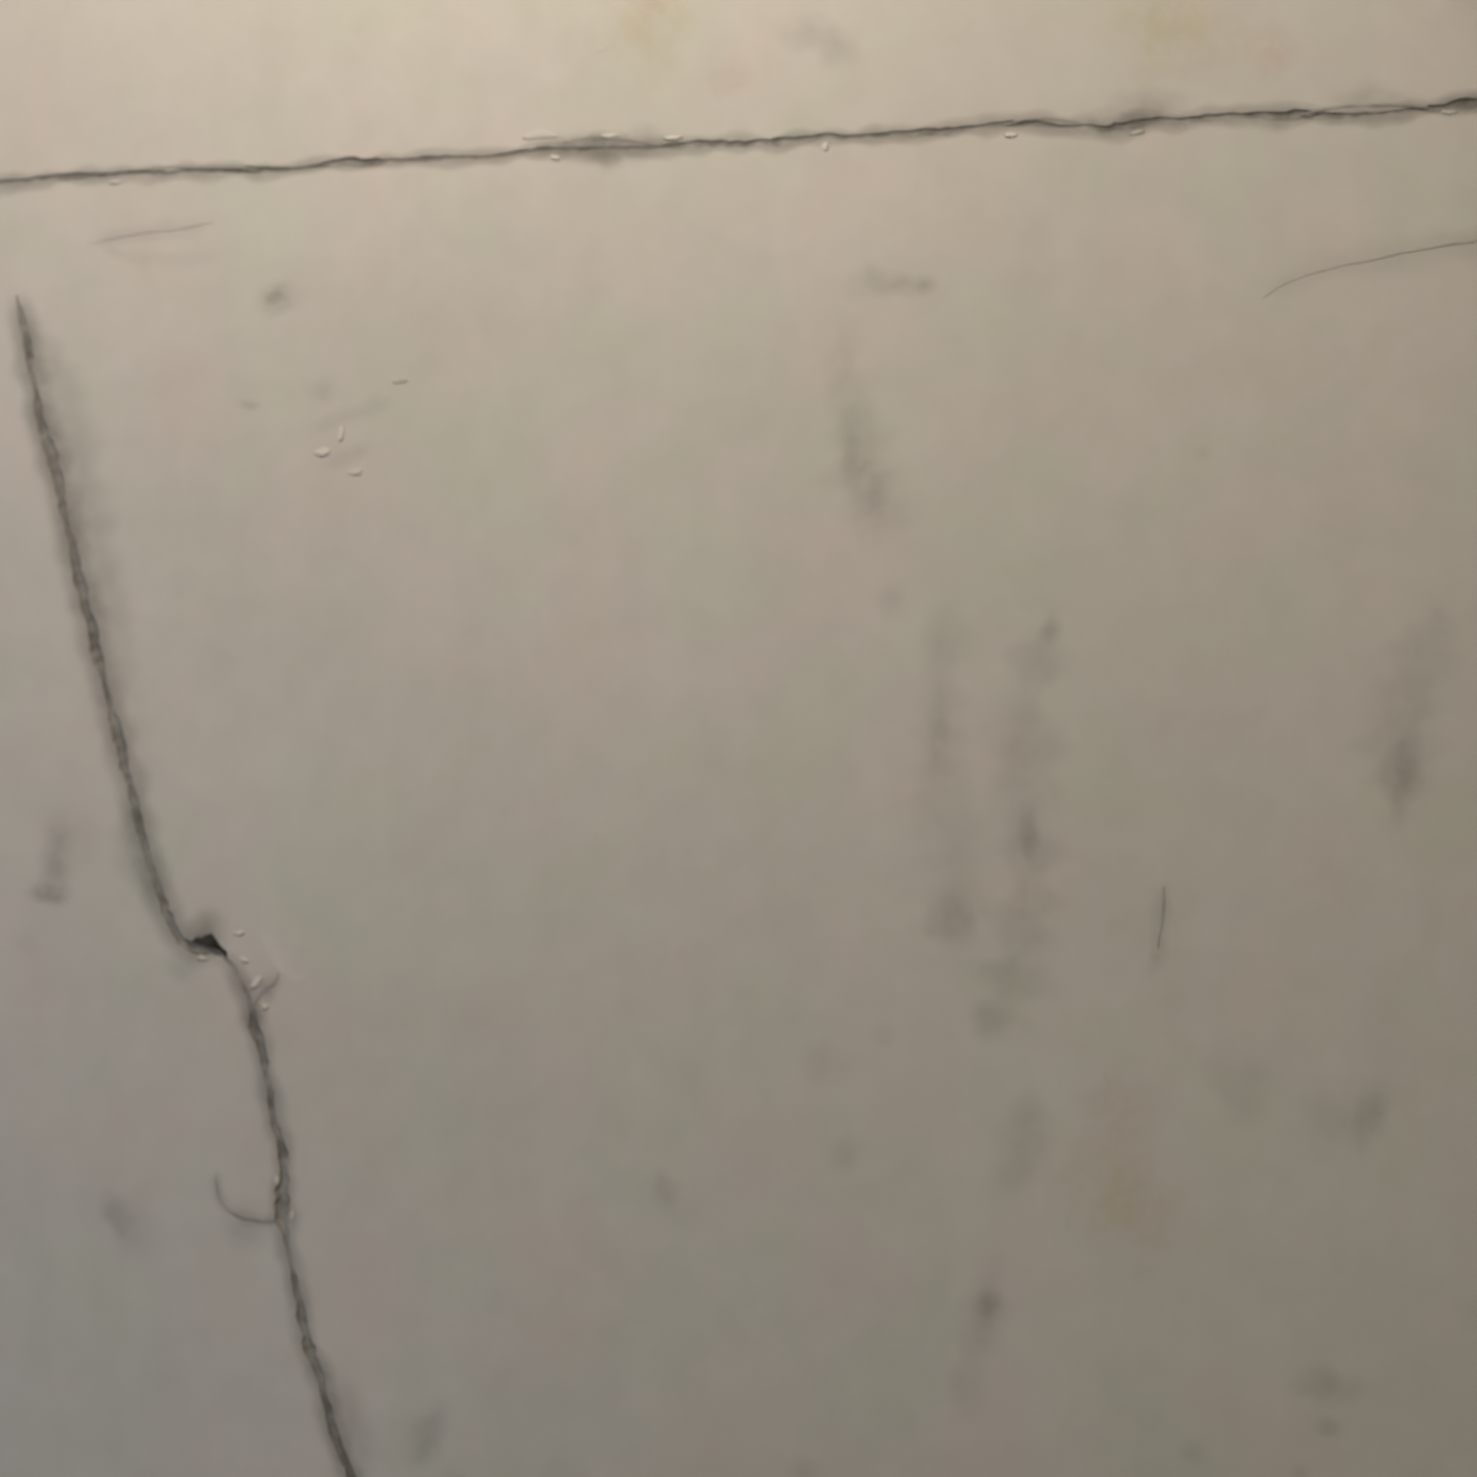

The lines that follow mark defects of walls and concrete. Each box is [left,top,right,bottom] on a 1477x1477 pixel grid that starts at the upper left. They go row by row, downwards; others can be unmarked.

crack [0,98,1477,184]
crack [16,297,356,1477]